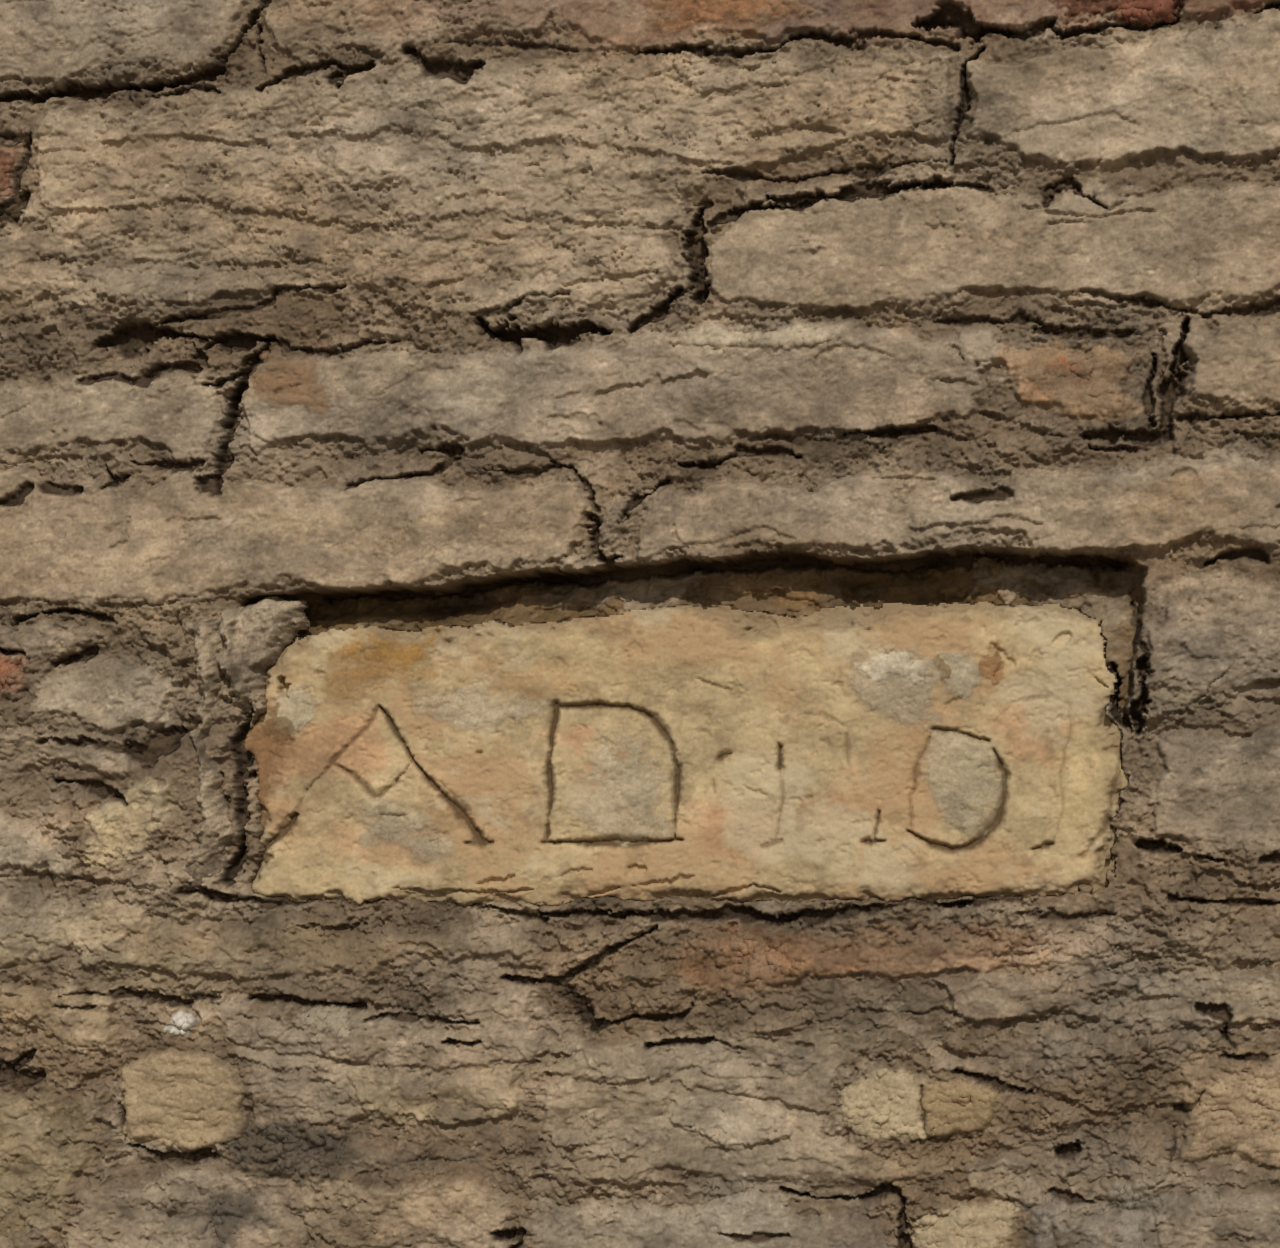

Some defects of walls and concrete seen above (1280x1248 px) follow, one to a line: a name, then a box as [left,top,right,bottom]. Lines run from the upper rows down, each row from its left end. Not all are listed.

crack [0,286,395,506]
crack [325,436,1127,602]
crack [1110,602,1149,734]
crack [437,896,1114,1048]